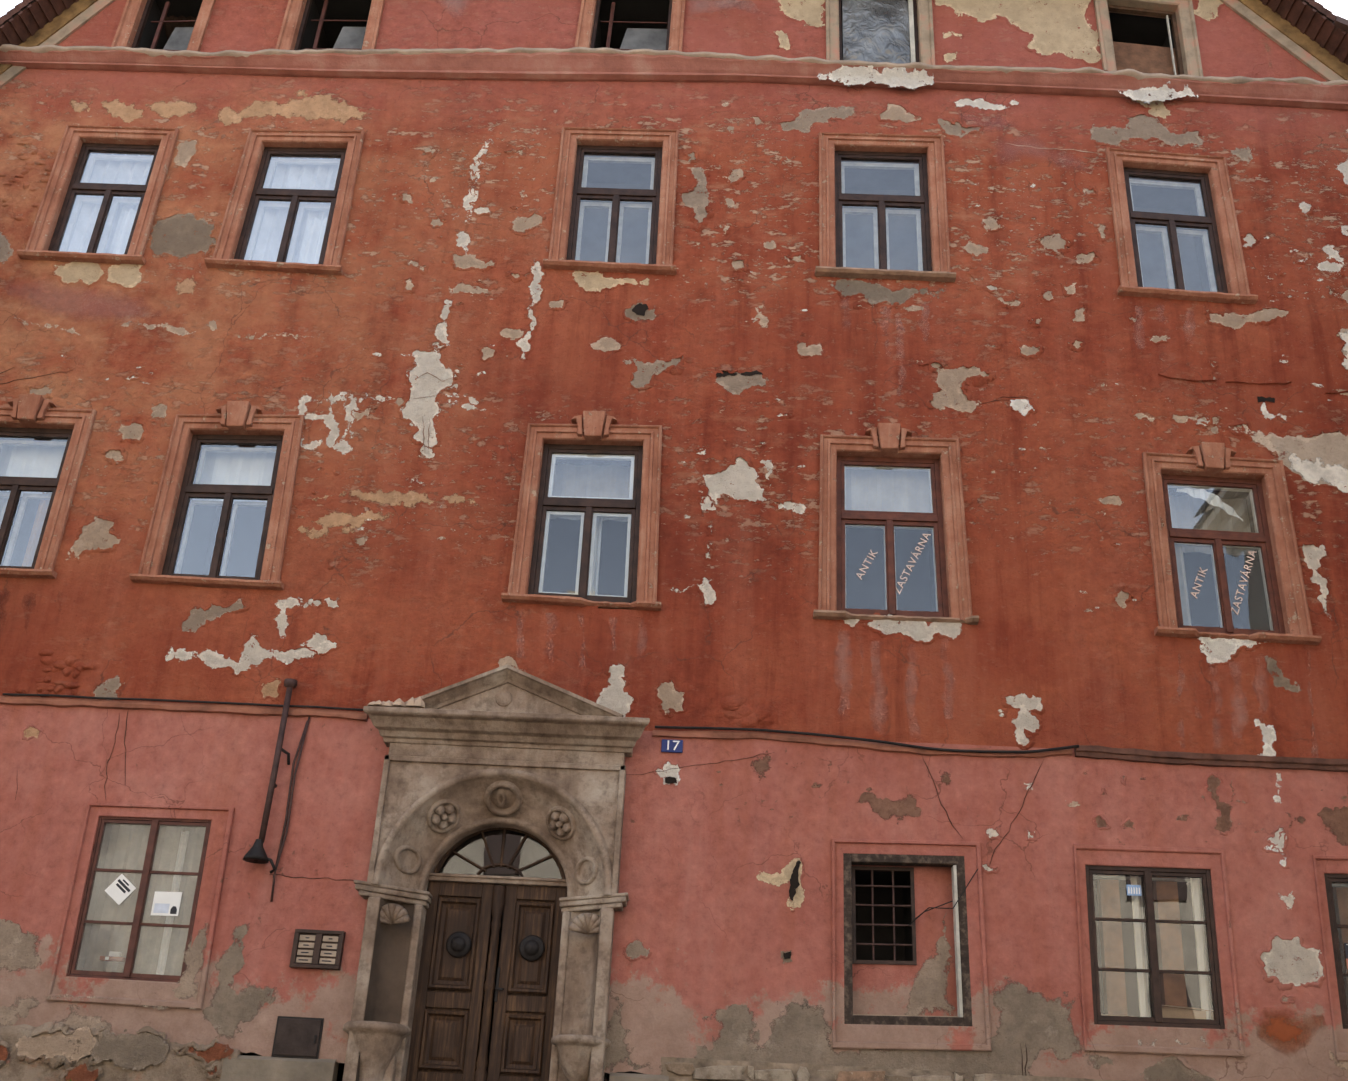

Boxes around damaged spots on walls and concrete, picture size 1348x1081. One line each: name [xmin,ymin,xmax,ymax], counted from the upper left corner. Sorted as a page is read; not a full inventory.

flaking render [933,0,1101,66]
flaking render [817,65,1019,138]
flaking render [298,139,657,476]
flaking render [1202,225,1348,329]
flaking render [1130,396,1348,493]
flaking render [669,440,806,608]
flaking render [165,596,341,701]
flaking render [1198,637,1301,693]
flaking render [999,693,1045,750]
crack [922,756,961,836]
crack [986,764,1042,871]
flaking render [0,919,278,1081]